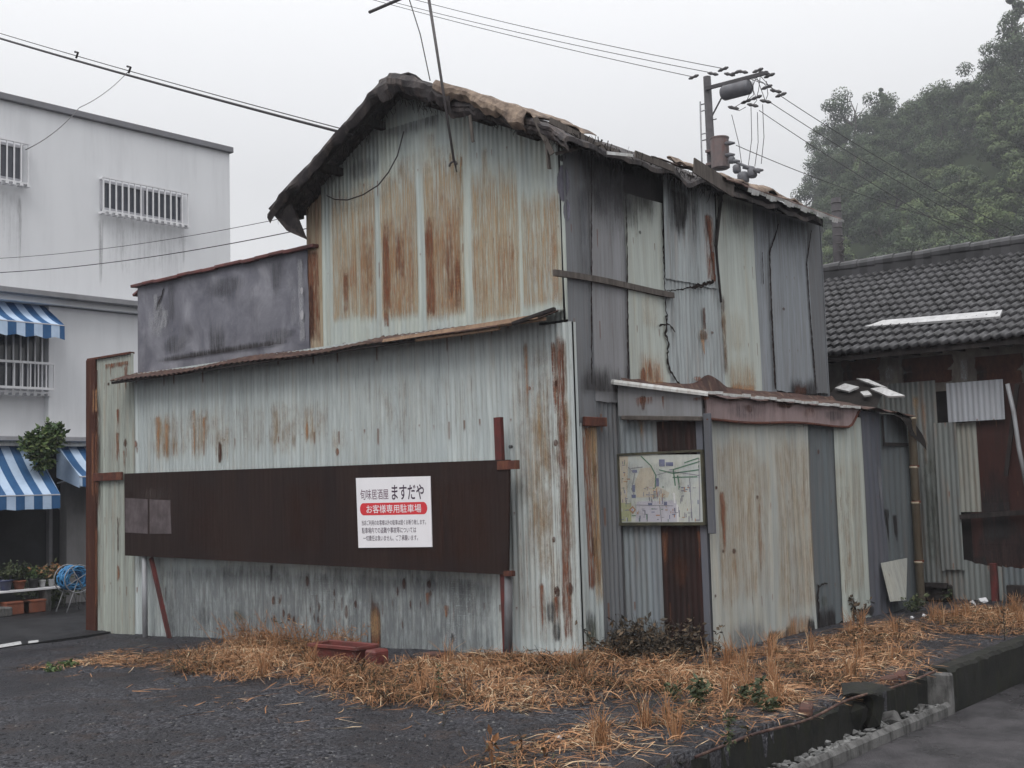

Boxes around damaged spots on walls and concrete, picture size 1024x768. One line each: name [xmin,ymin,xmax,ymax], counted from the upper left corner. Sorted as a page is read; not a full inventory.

damp [165,333,285,361]
rust [306,160,562,348]
crack [659,206,714,384]
rust [704,215,716,281]
rust [535,337,573,637]
rust [715,487,737,580]